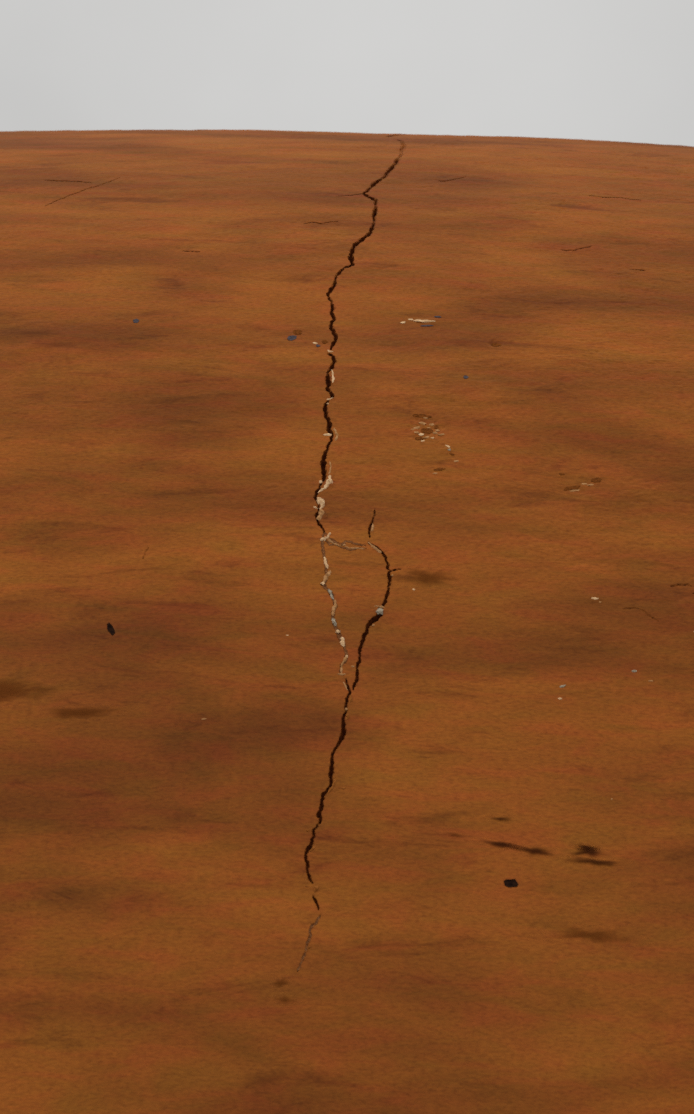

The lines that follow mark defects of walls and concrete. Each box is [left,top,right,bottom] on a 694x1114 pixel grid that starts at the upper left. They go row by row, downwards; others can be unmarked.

crack [297,134,404,971]